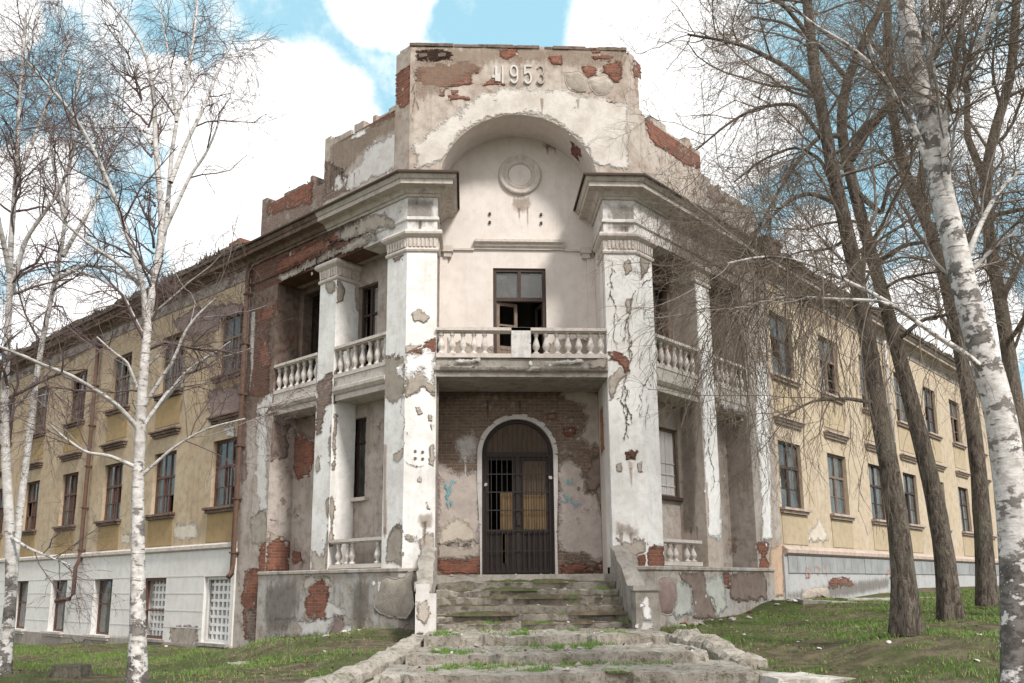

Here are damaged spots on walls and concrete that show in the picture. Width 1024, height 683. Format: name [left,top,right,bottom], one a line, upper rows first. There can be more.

flaking render [581,48,642,83]
flaking render [335,48,505,142]
flaking render [266,161,352,215]
flaking render [631,119,733,205]
crack [607,262,653,440]
flaking render [270,369,339,481]
flaking render [393,444,436,467]
flaking render [240,496,345,642]
flaking render [385,523,480,575]
flaking render [559,561,603,574]
flaking render [679,571,717,621]
flaking render [828,576,854,590]